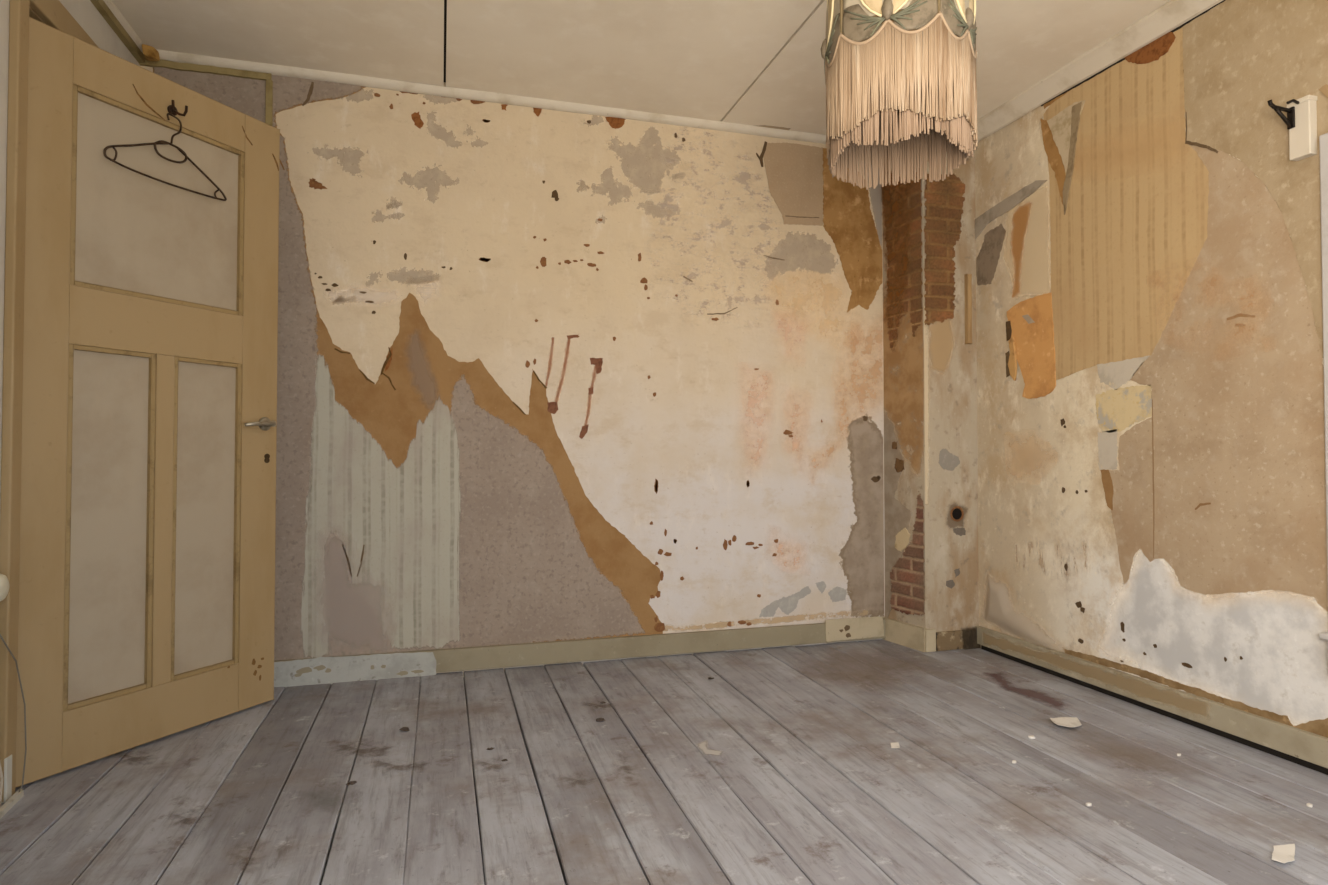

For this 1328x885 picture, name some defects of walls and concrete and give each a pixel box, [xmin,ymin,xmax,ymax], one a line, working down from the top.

peeling [313,144,368,177]
peeling [372,197,404,222]
peeling [398,163,459,204]
peeling [423,95,490,148]
peeling [577,127,838,281]
peeling [333,267,439,305]
corrosion [525,335,580,414]
corrosion [579,358,603,439]
flaking render [825,156,965,642]
peeling [1095,356,1152,470]
peeling [759,581,847,617]
peeling [1064,638,1328,738]